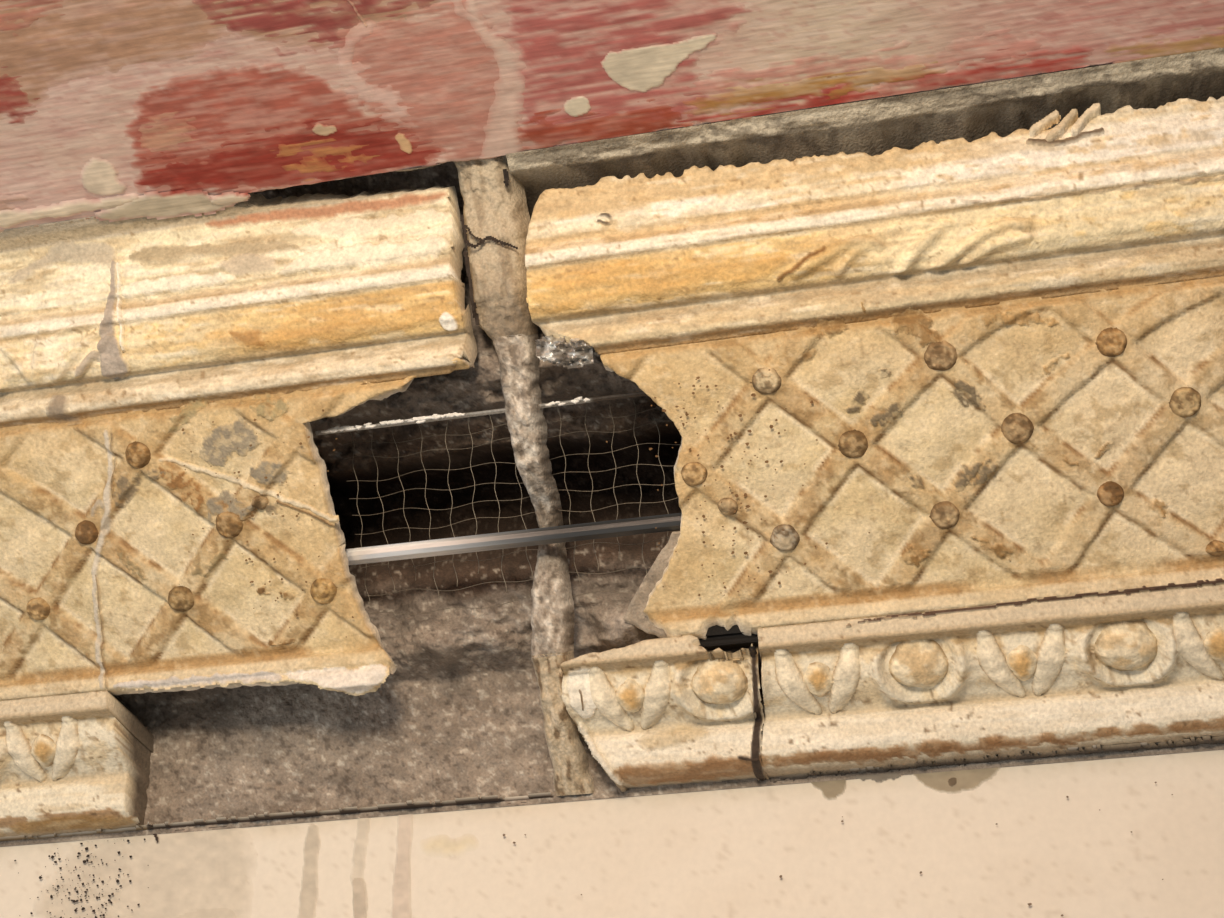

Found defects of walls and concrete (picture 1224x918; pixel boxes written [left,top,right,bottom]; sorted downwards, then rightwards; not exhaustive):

crack [74,260,131,381]
peeling [111,392,293,524]
peeling [321,412,465,433]
crack [89,429,117,691]
crack [846,578,1224,628]
peeling [113,663,390,695]
peeling [566,666,625,785]
crack [737,646,1224,783]
damp [19,827,258,918]
damp [297,824,321,918]
damp [350,817,371,918]
damp [391,814,479,918]